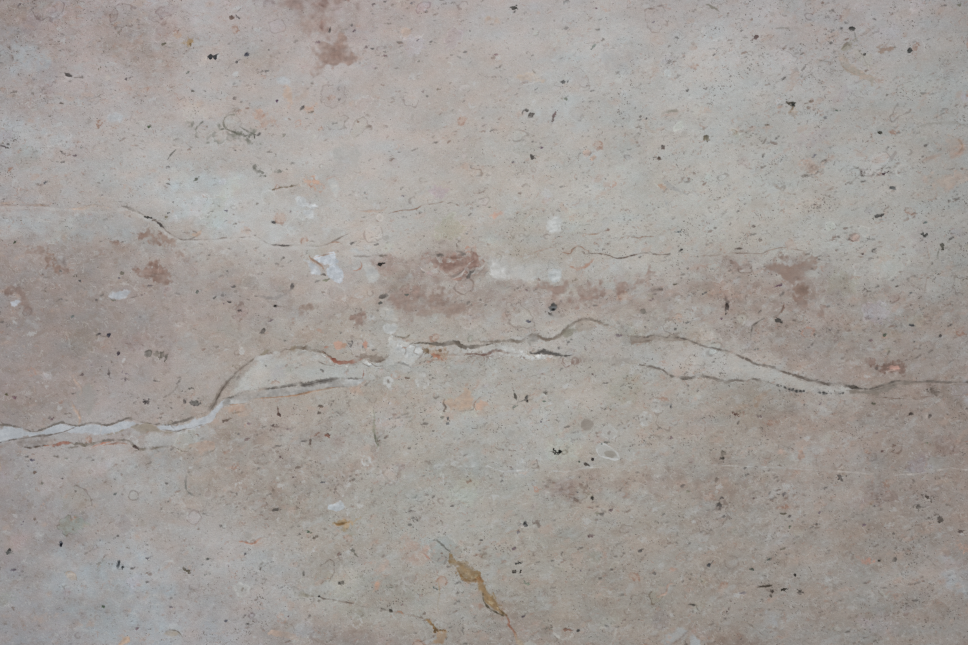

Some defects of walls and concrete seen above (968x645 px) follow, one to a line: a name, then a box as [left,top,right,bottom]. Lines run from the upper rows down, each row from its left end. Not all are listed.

crack [0,301,968,488]